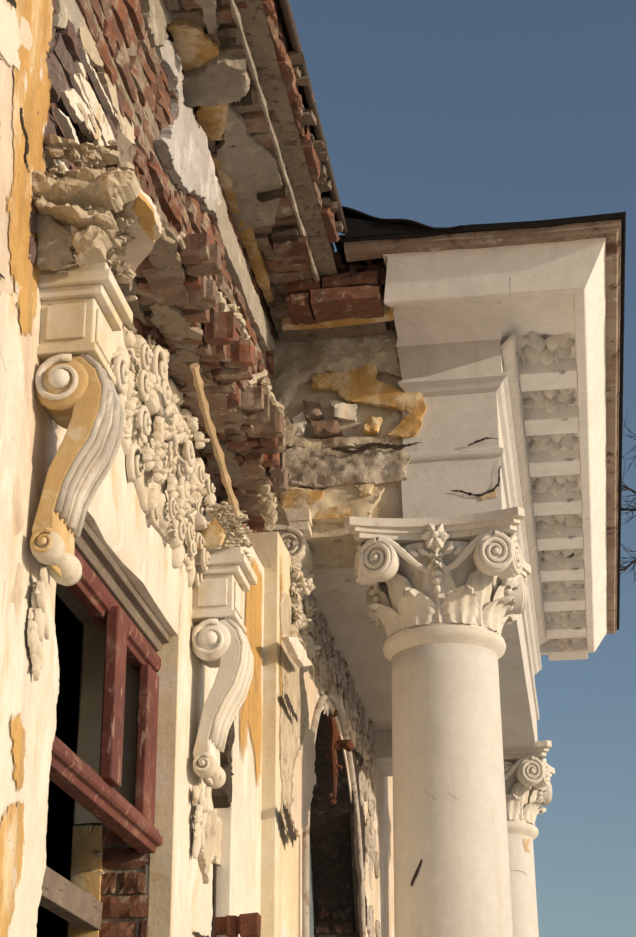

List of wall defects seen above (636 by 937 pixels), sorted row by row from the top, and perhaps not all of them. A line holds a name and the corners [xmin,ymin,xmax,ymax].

crack [468,437,497,446]
peeling [0,0,426,937]
crack [451,465,501,501]